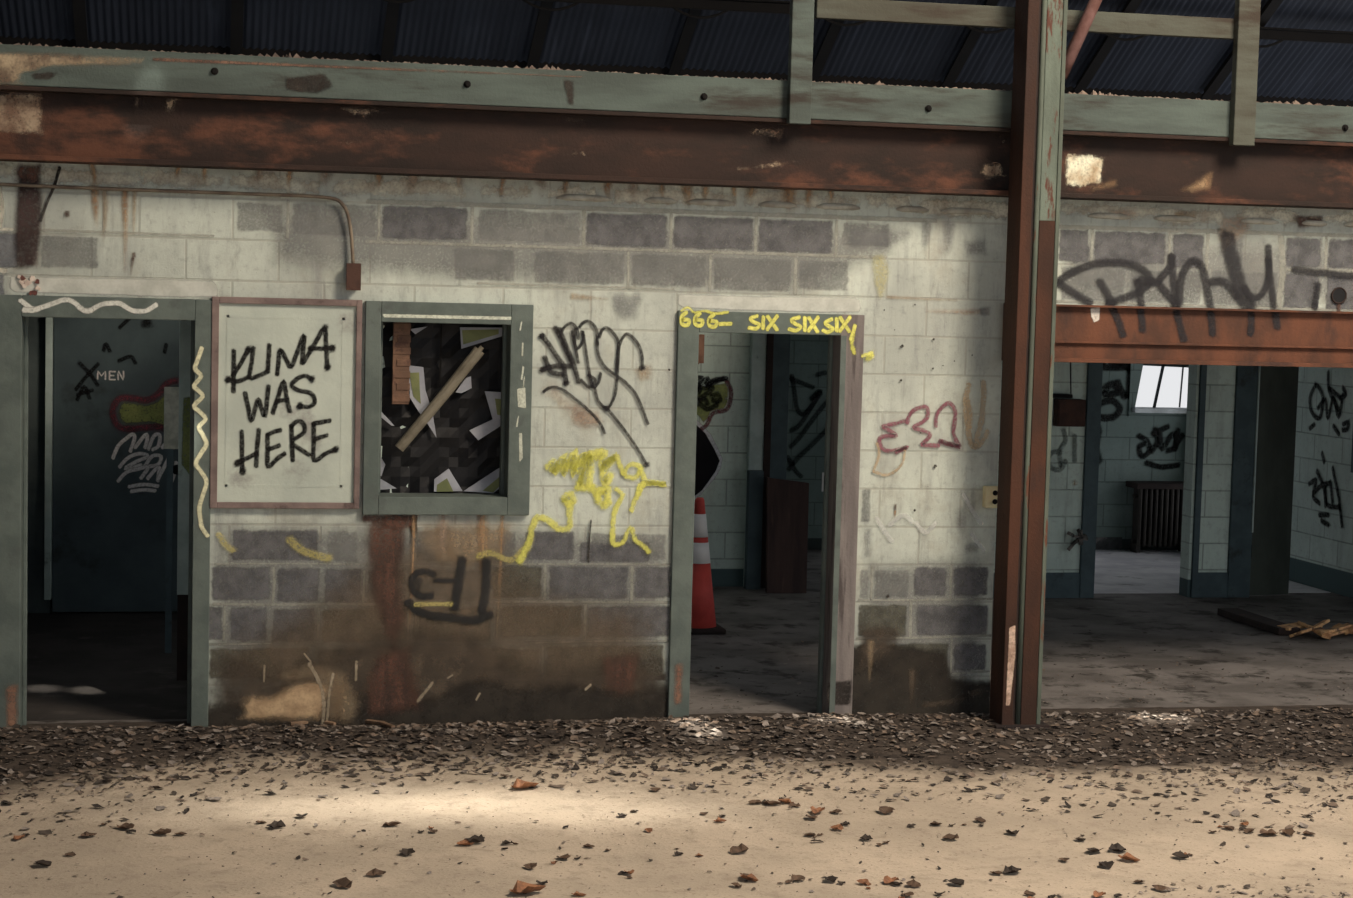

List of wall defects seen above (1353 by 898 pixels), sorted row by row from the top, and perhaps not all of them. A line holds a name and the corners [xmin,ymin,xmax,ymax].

peeling [0,94,41,133]
corrosion [16,165,42,267]
peeling [1066,154,1102,186]
corrosion [363,515,417,635]
damp [208,553,668,726]